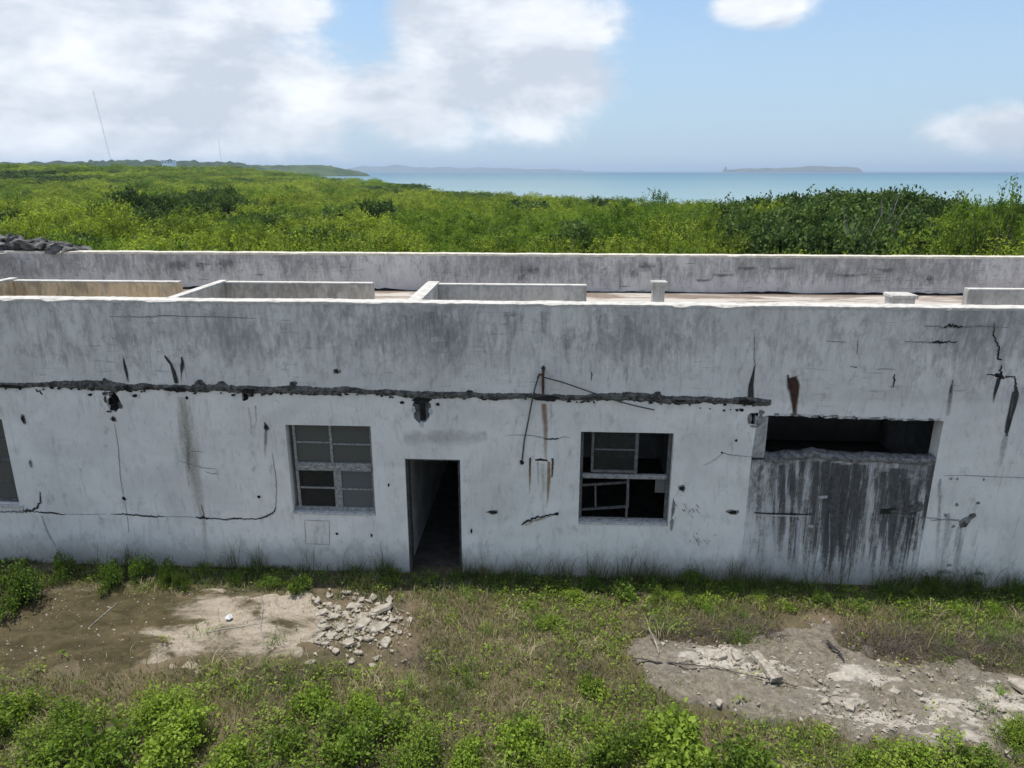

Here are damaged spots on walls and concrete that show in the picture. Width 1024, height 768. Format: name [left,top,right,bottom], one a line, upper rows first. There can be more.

spalling [0,378,941,428]
corrosion [787,375,799,414]
crack [905,323,1014,400]
crack [0,424,277,545]
corrosion [529,458,554,500]
damp [756,461,941,581]